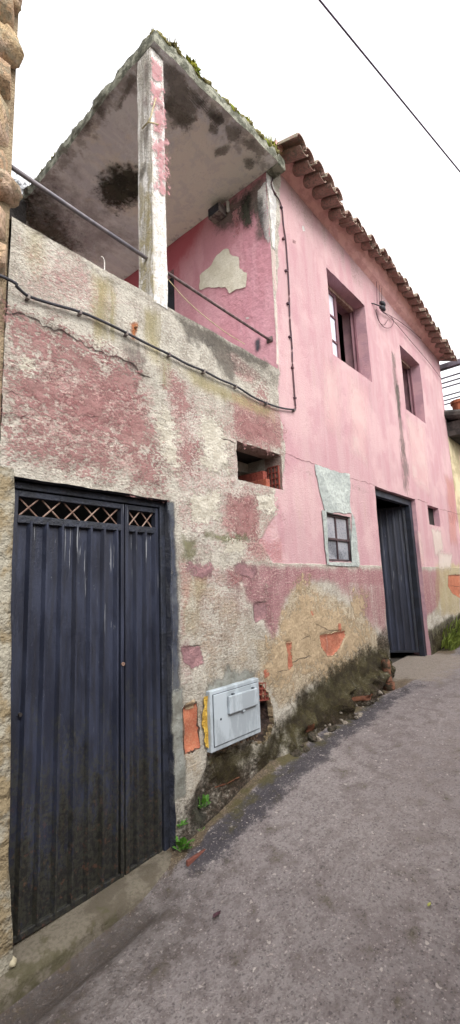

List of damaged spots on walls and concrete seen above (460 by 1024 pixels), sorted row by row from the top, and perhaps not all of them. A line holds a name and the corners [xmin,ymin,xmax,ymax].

damp [97,161,146,216]
spalling [150,57,265,195]
flaking render [199,248,247,293]
damp [217,179,269,237]
spalling [257,173,277,249]
peeling [0,295,287,588]
damp [392,354,408,489]
peeling [315,464,360,567]
spalling [182,573,375,788]
damp [256,644,394,769]